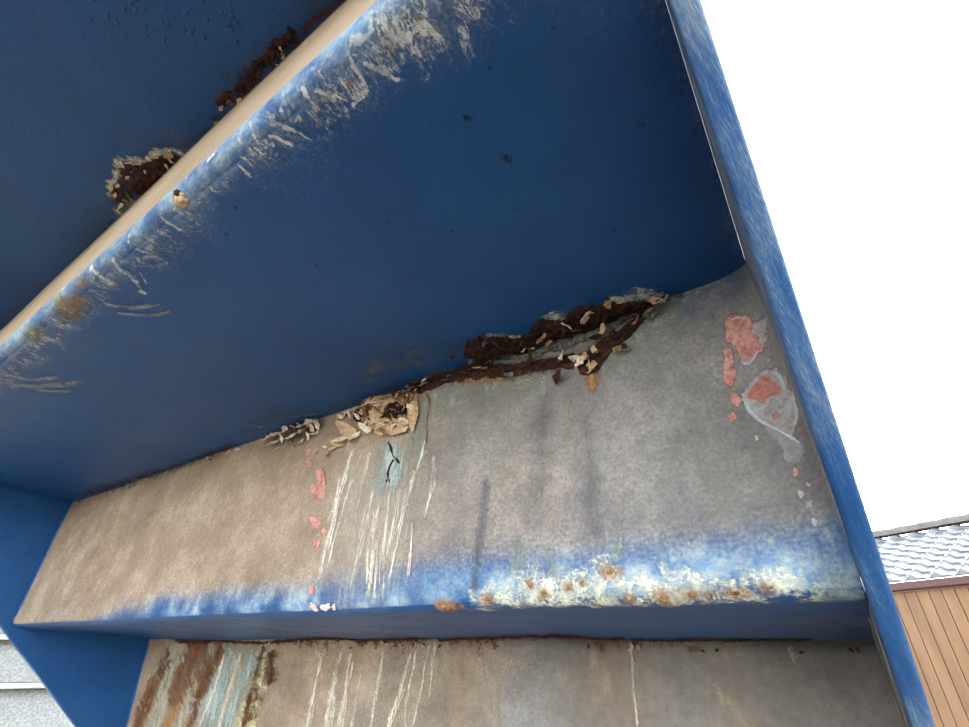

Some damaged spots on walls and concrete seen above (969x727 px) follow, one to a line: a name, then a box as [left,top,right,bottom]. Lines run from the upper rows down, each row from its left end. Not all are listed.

rust [102,0,344,230]
peeling [75,444,247,504]
peeling [259,387,417,500]
peeling [722,314,818,526]
peeling [309,516,327,549]
rust [434,535,821,611]
rust [132,633,814,727]